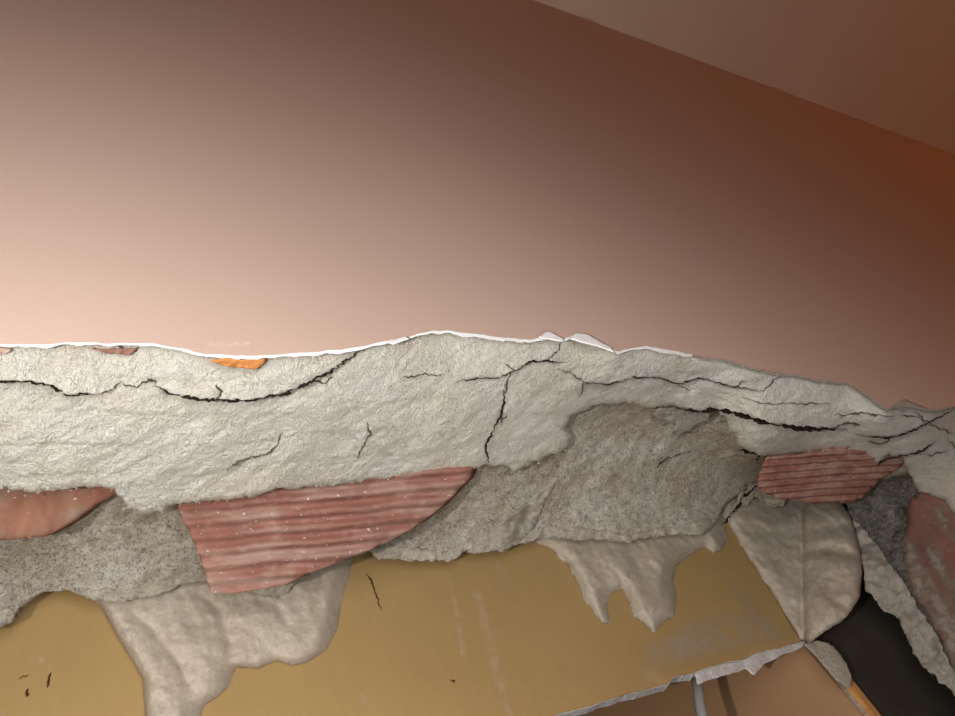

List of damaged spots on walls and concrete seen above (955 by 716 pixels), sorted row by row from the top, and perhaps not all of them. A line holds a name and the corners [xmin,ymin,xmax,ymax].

crack [0,349,365,403]
crack [227,432,283,471]
spalling [0,330,955,696]
crack [403,342,955,469]